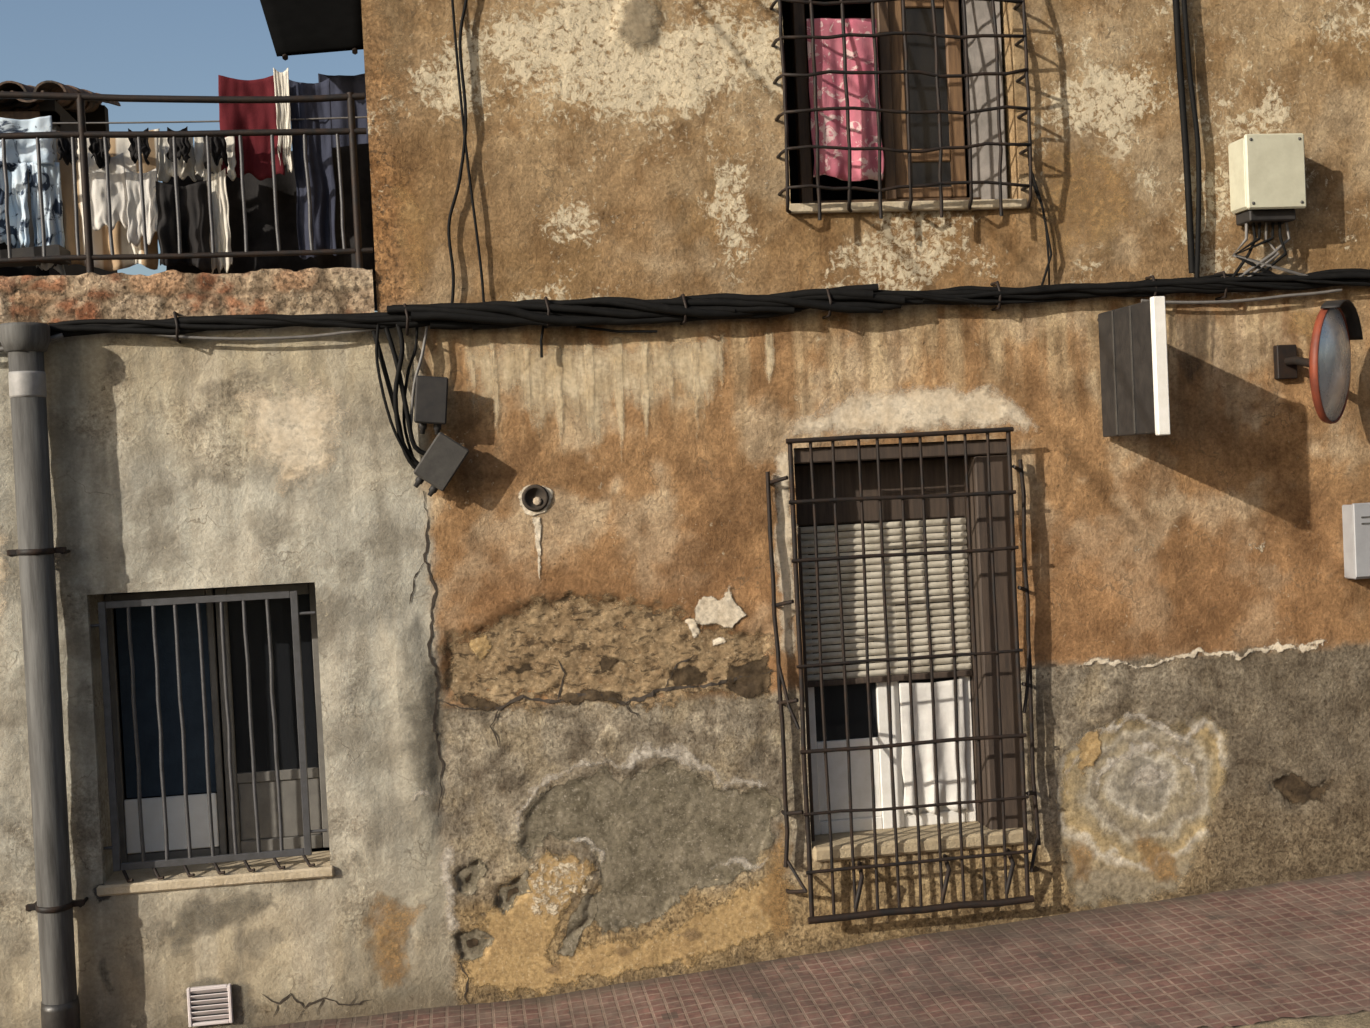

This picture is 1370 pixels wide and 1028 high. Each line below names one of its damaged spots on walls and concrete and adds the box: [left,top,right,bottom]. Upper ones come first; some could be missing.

crack [409,491,770,817]
spalling [435,484,775,714]
water stain [1057,712,1228,909]
crack [261,984,368,1021]
spalling [462,852,788,998]